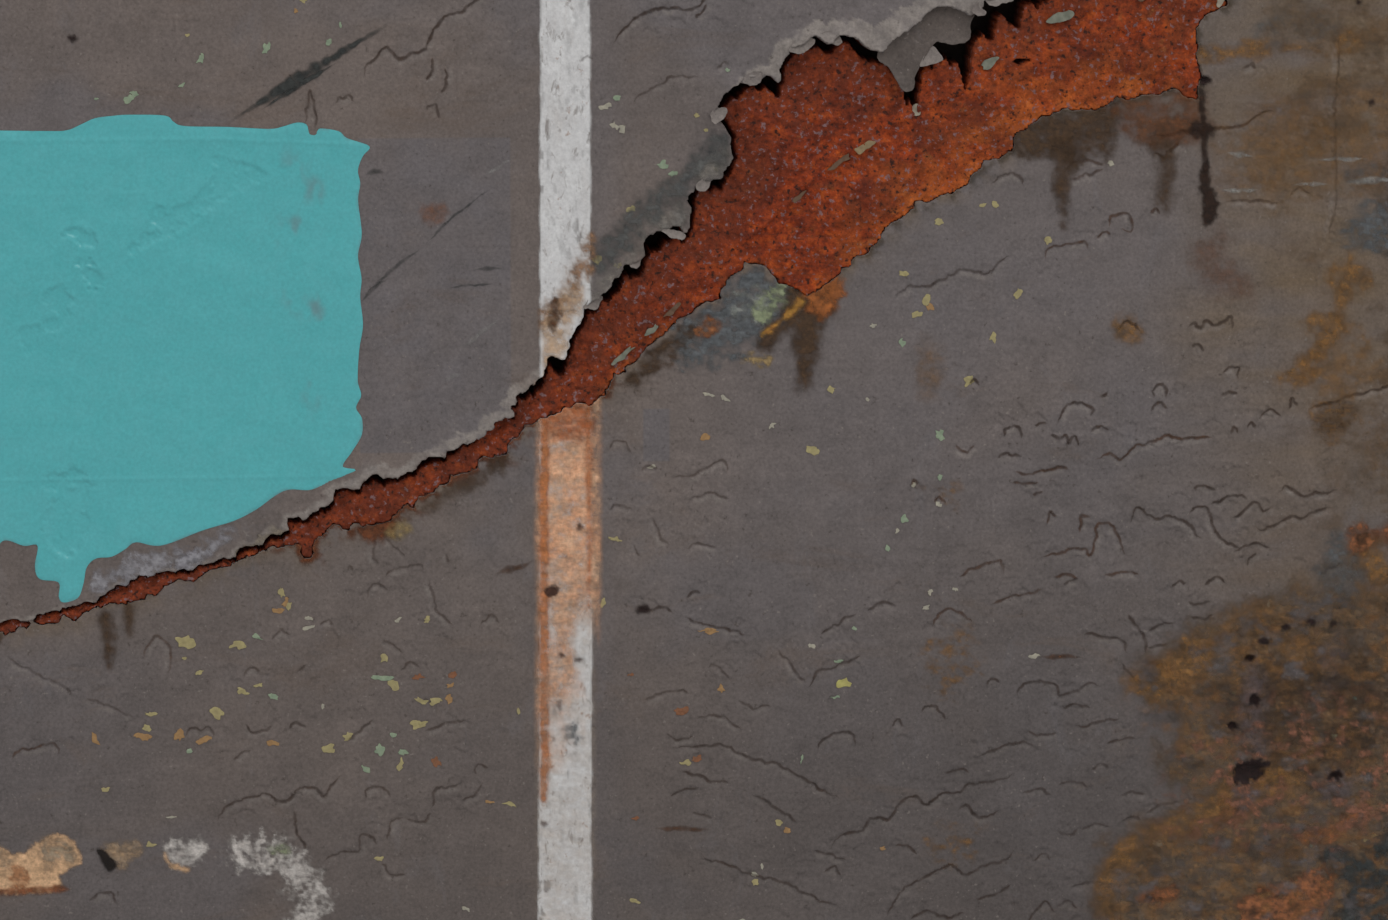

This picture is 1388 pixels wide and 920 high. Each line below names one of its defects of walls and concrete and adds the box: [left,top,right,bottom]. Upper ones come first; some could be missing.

crack [372,4,470,80]
crack [617,0,706,37]
rust [0,0,1227,802]
crack [1003,367,1386,578]
peeling [90,527,282,592]
spalling [545,586,559,597]
spalling [175,635,203,675]
spalling [371,654,425,691]
spalling [410,671,457,730]
spalling [832,660,852,699]
crack [848,784,993,834]
rust [1236,869,1336,920]